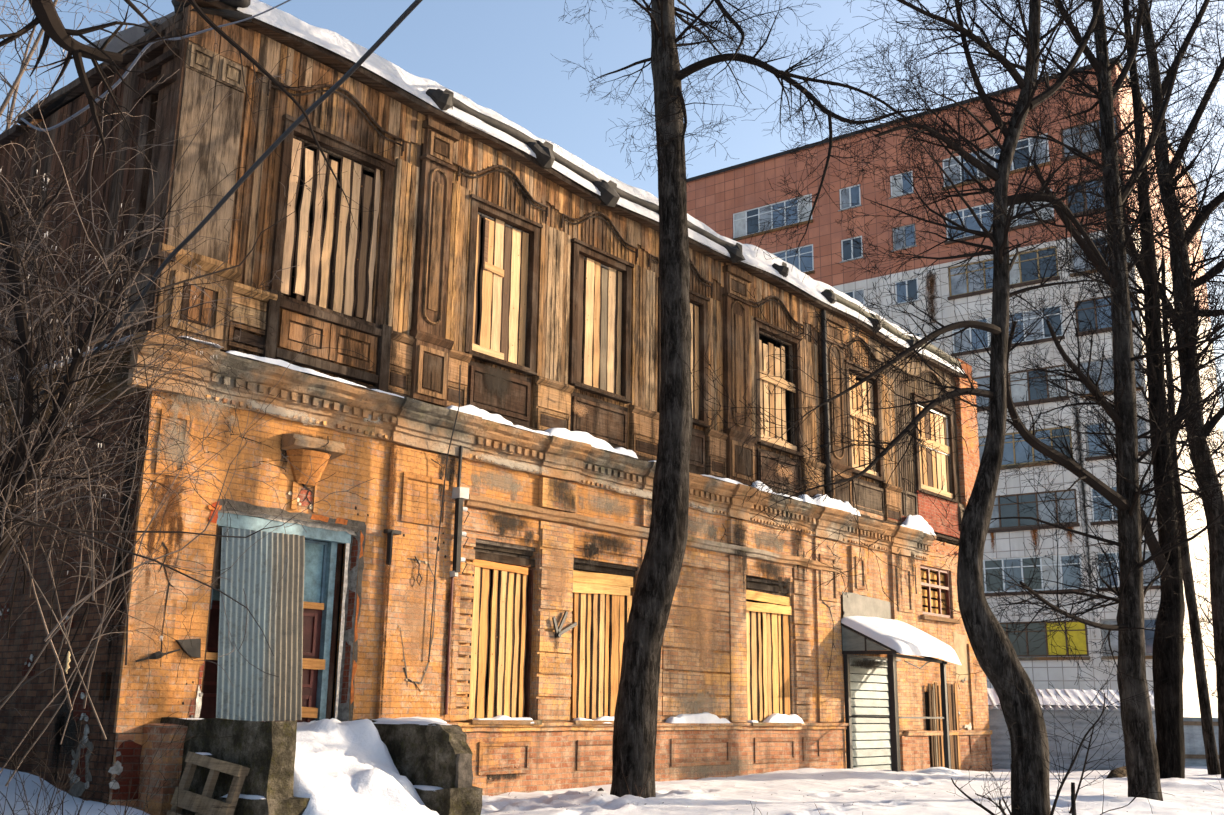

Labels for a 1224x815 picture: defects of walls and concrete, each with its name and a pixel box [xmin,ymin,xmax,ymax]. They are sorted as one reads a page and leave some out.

water stain [92,401,143,800]
water stain [146,475,183,585]
spalling [208,487,366,722]
water stain [488,512,534,554]
water stain [585,534,631,562]